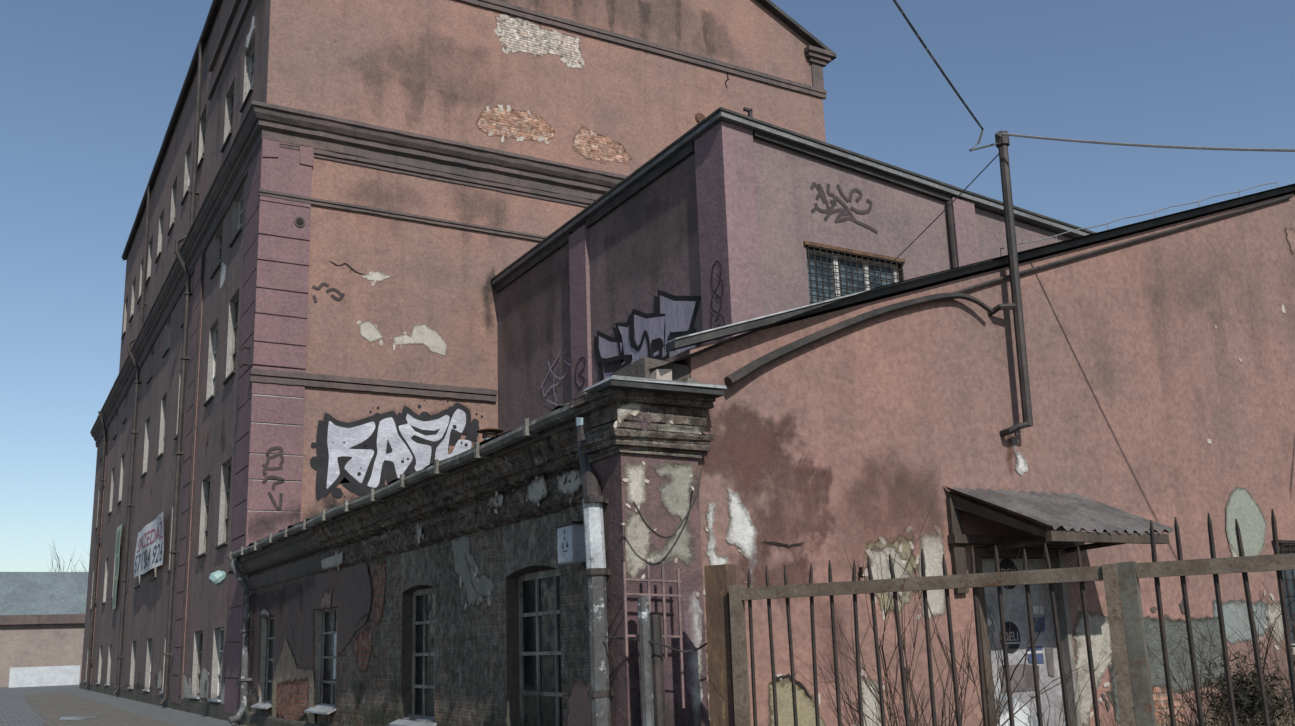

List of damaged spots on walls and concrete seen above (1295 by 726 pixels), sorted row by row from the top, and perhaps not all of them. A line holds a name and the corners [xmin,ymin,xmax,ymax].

flaking render [494,14,584,69]
flaking render [476,104,555,144]
peeling [356,320,447,356]
damp [703,405,834,546]
peeling [1226,487,1268,557]
crack [356,561,374,626]
peeling [621,461,758,726]
peeling [862,525,946,621]
peeling [271,636,315,725]
peeling [768,673,826,726]
peeling [1073,604,1121,726]
spalling [1144,589,1295,726]